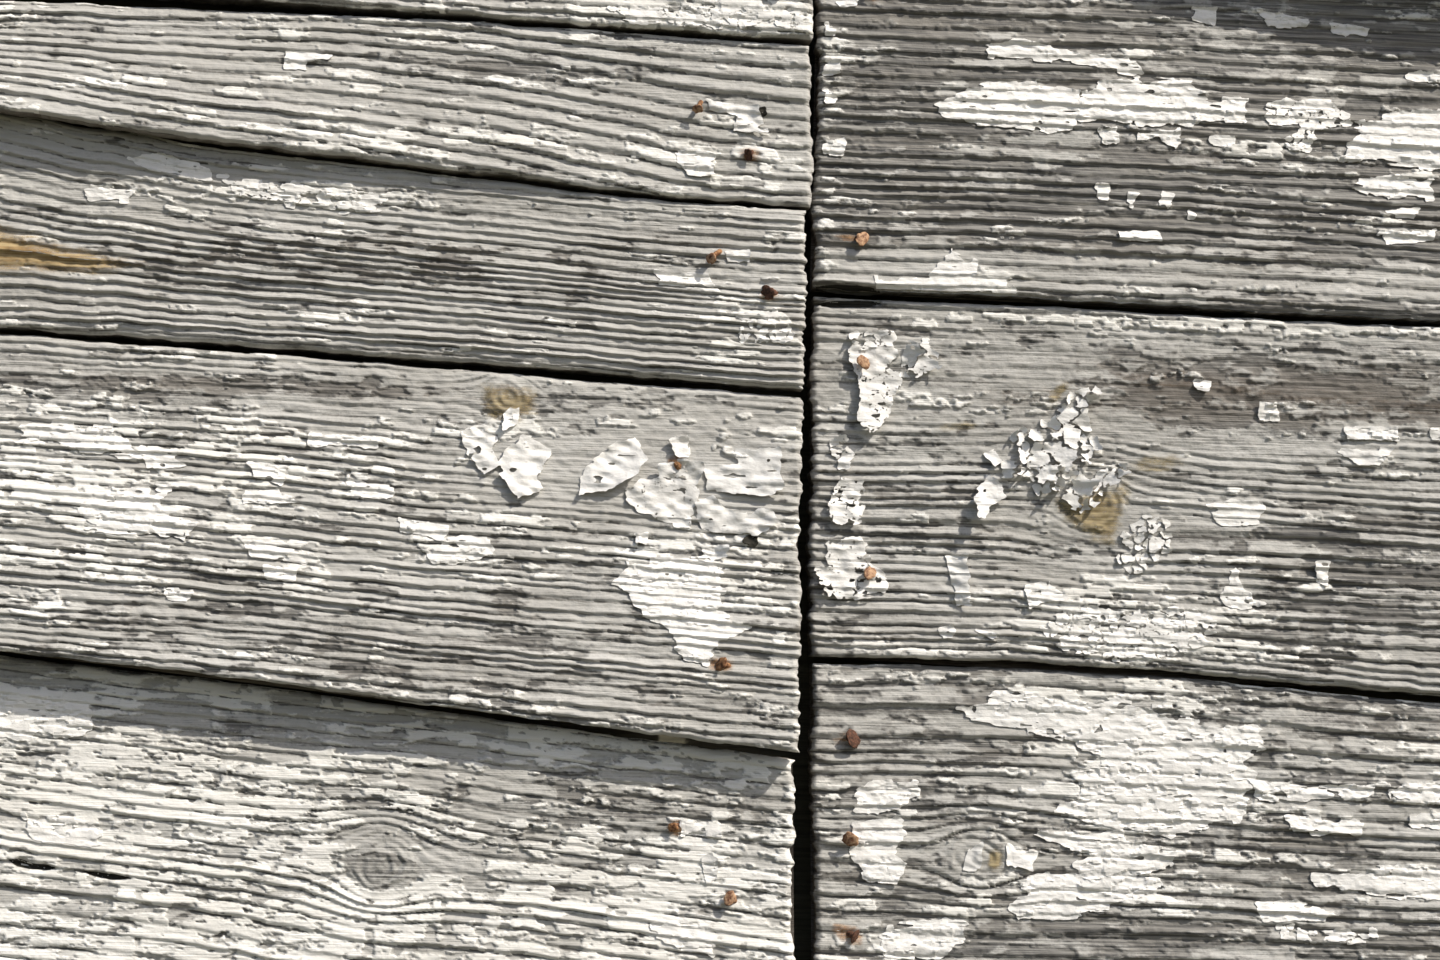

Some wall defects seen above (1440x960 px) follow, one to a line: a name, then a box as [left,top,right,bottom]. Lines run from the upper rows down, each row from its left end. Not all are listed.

peeling [934,38,1249,149]
peeling [1404,70,1440,83]
peeling [1094,183,1140,209]
peeling [1118,230,1163,242]
peeling [1158,191,1197,220]
peeling [1264,97,1440,245]
peeling [848,330,943,432]
peeling [461,407,551,498]
peeling [973,385,1131,519]
peeling [814,434,889,600]
peeling [945,553,972,606]
peeling [1115,513,1173,574]